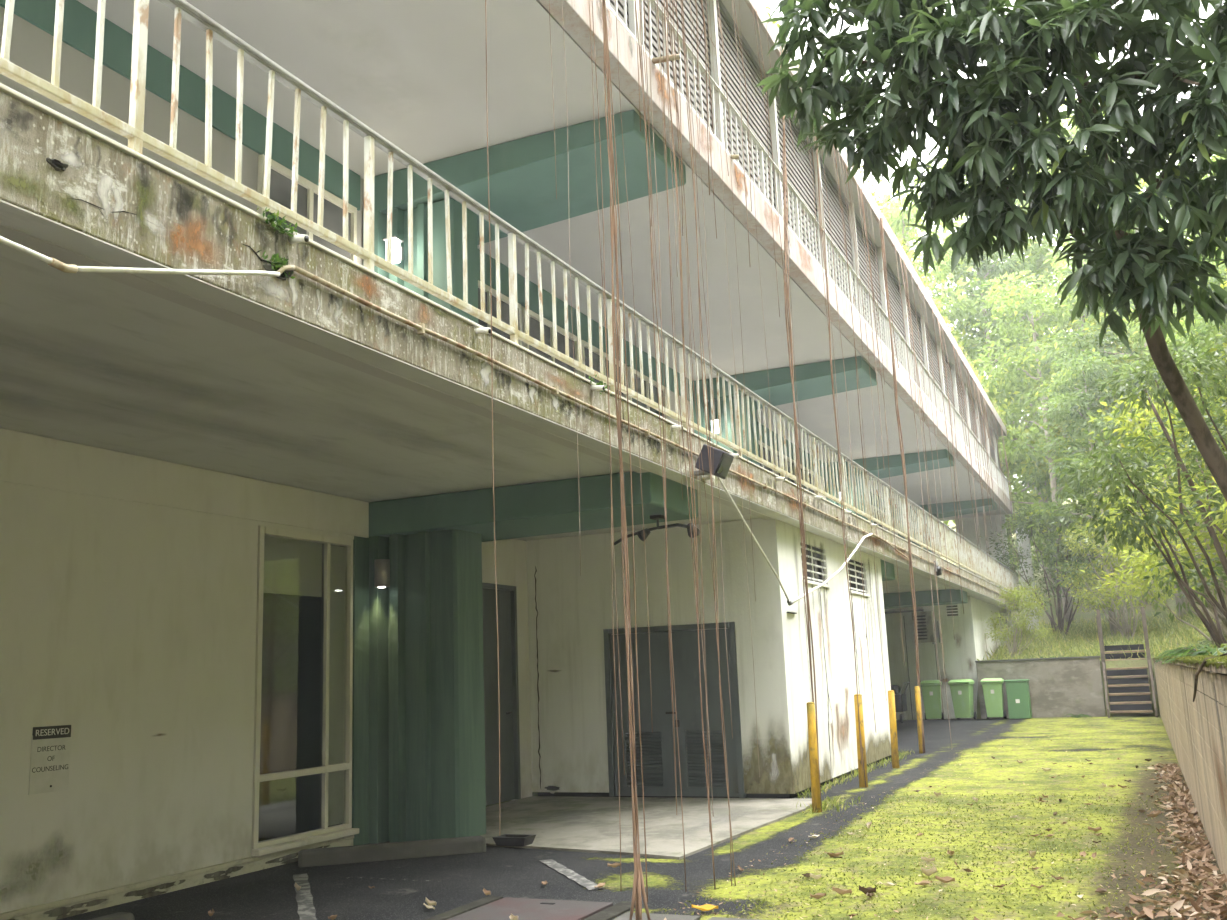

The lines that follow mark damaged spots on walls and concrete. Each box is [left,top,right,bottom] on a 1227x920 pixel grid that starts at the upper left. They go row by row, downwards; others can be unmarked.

damp [64,138,80,166]
damp [98,175,166,234]
damp [172,185,235,239]
damp [461,352,510,386]
damp [526,383,579,415]
peeling [204,866,246,880]
peeling [36,880,186,920]